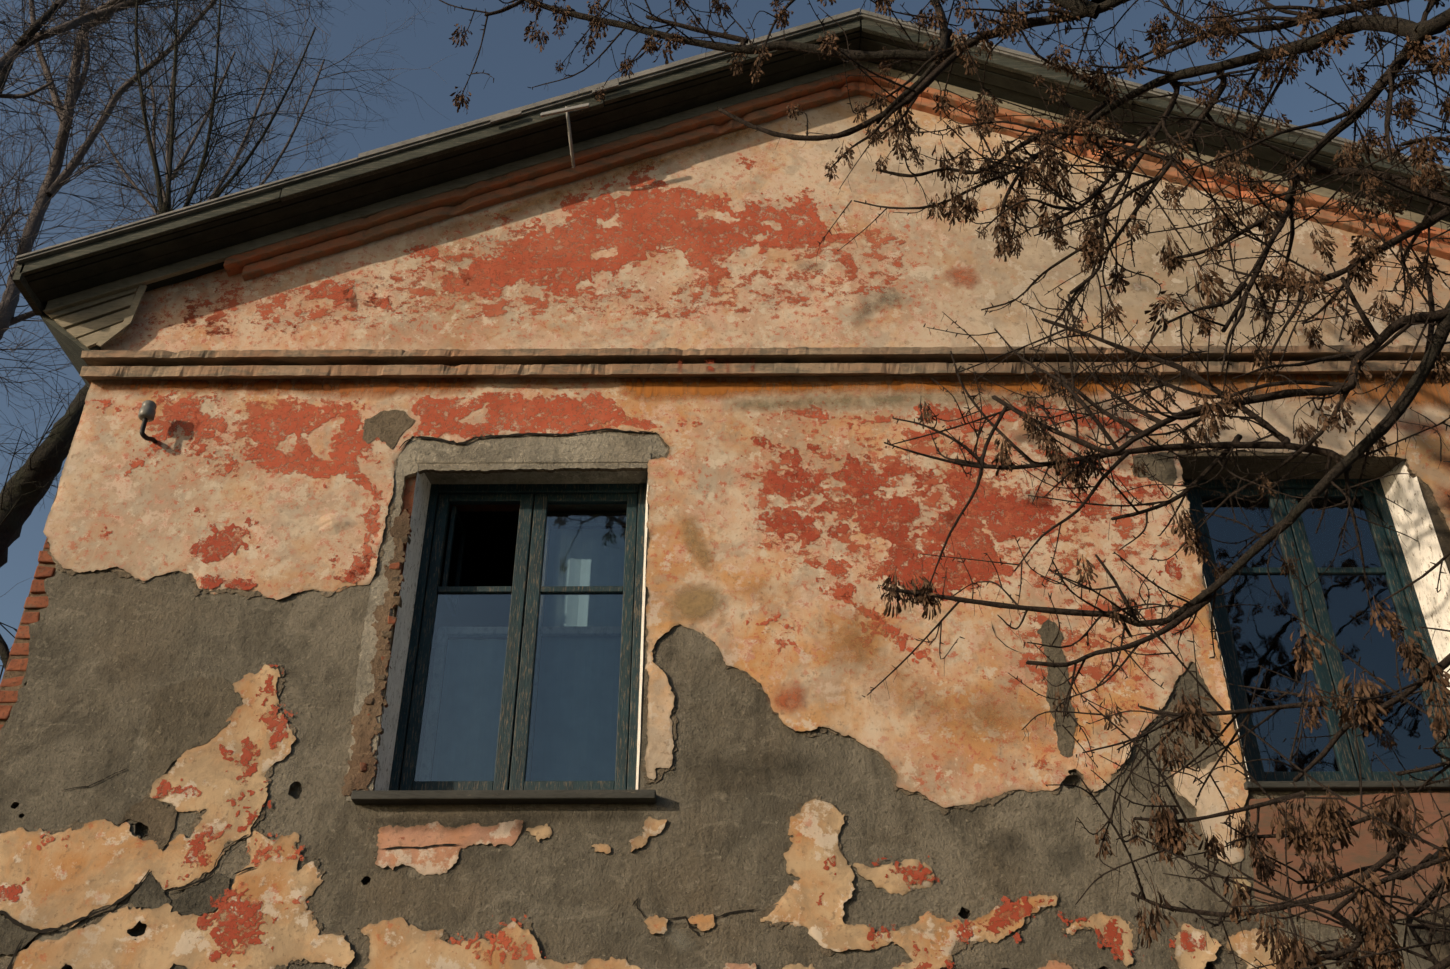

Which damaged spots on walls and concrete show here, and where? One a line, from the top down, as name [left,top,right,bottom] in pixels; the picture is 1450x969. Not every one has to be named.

peeling [147,165,907,345]
spalling [0,388,1450,969]